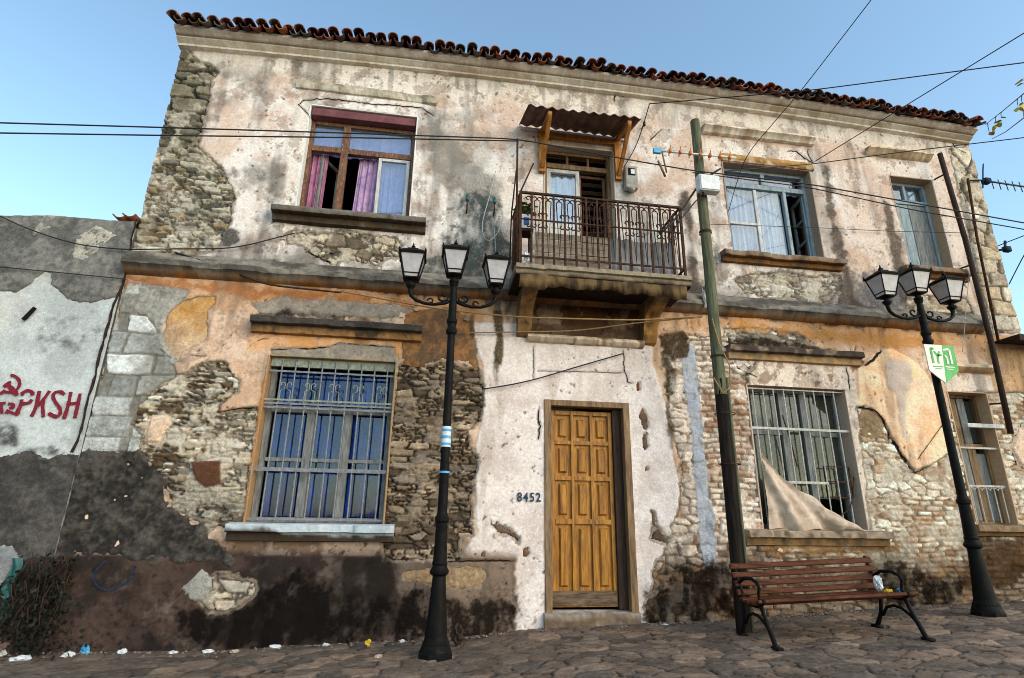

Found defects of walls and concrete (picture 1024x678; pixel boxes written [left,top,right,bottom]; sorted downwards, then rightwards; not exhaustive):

spalling [133,49,235,255]
spalling [276,229,401,267]
spalling [82,279,258,533]
spalling [202,573,255,611]
leakage [177,557,431,649]
spalling [383,307,487,592]
leakage [446,596,518,637]
leakage [643,561,735,623]
spalling [644,328,803,623]
spalling [746,404,976,617]
crack [846,350,942,474]
spalling [982,393,1024,603]